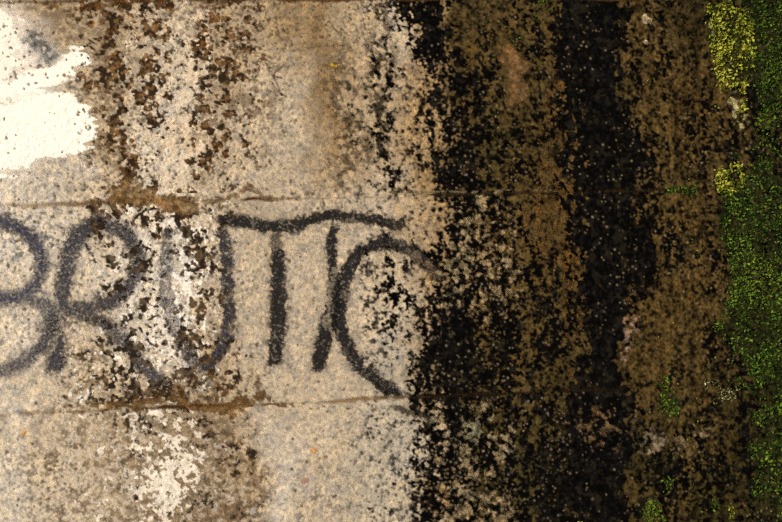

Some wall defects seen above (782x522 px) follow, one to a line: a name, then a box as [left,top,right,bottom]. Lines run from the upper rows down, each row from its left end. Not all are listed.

corrosion [34,0,140,12]
corrosion [95,176,284,217]
corrosion [59,370,293,419]
water stain [390,406,428,421]